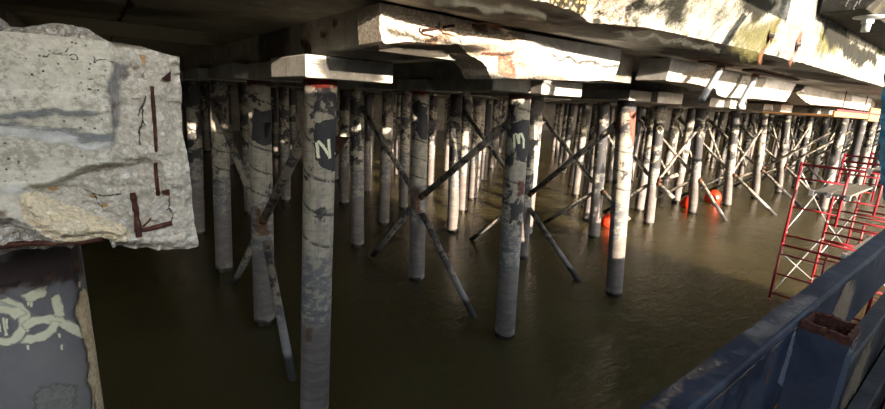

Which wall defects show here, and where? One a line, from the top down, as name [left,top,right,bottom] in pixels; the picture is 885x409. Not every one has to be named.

crack [43,0,135,63]
spalling [0,42,199,255]
crack [138,96,146,145]
corrosion [0,245,84,293]
peeling [75,281,104,409]